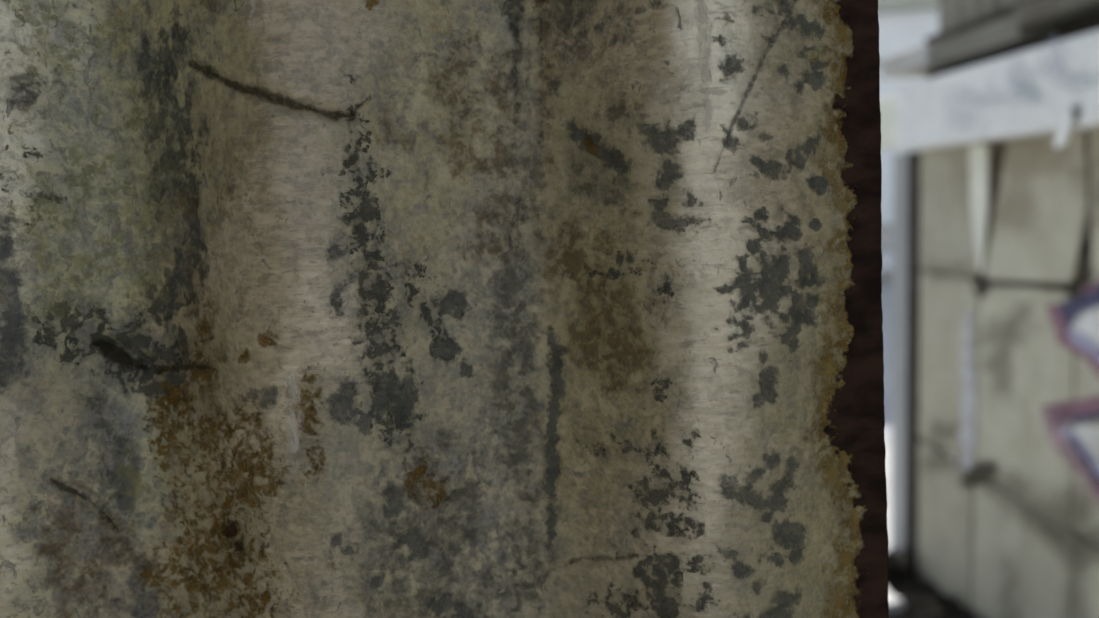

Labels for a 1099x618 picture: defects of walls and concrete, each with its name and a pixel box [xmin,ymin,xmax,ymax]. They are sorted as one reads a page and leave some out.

water stain [0,23,213,401]
rust [104,318,291,618]
rust [298,366,326,479]
water stain [339,74,455,449]
water stain [586,464,705,618]
rust [813,0,889,618]